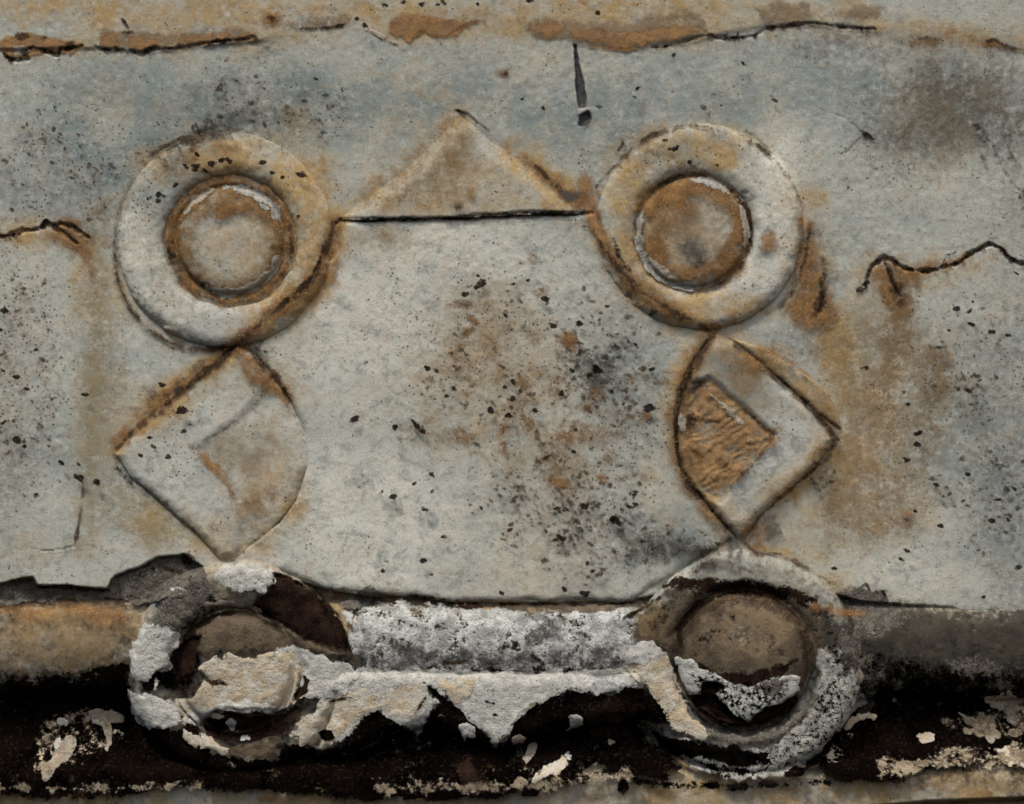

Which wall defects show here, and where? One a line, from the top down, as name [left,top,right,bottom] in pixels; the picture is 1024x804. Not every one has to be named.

crack [3,18,270,62]
crack [652,21,877,48]
crack [0,219,89,244]
crack [328,210,590,239]
rust [870,251,970,320]
crack [856,242,1024,294]
rust [522,155,840,556]
damp [448,279,854,693]
spalling [0,552,1024,798]
damp [0,647,1024,802]